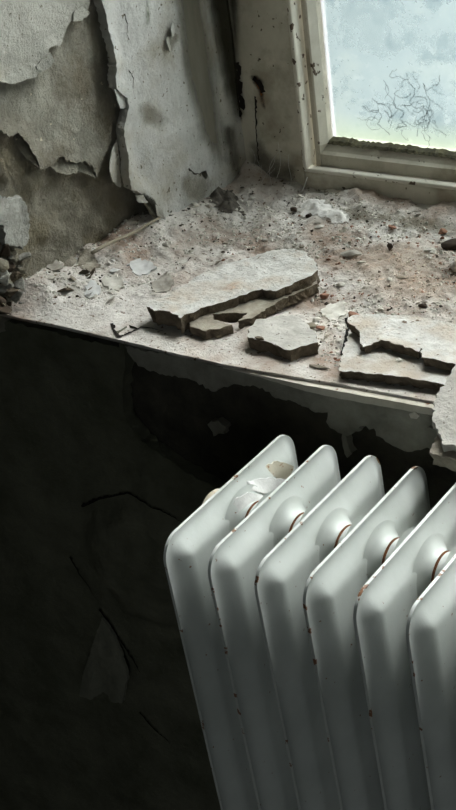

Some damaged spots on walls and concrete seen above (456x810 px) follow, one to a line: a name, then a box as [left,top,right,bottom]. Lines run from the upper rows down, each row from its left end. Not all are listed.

peeling [0,0,256,314]
peeling [316,301,346,336]
spalling [125,345,456,514]